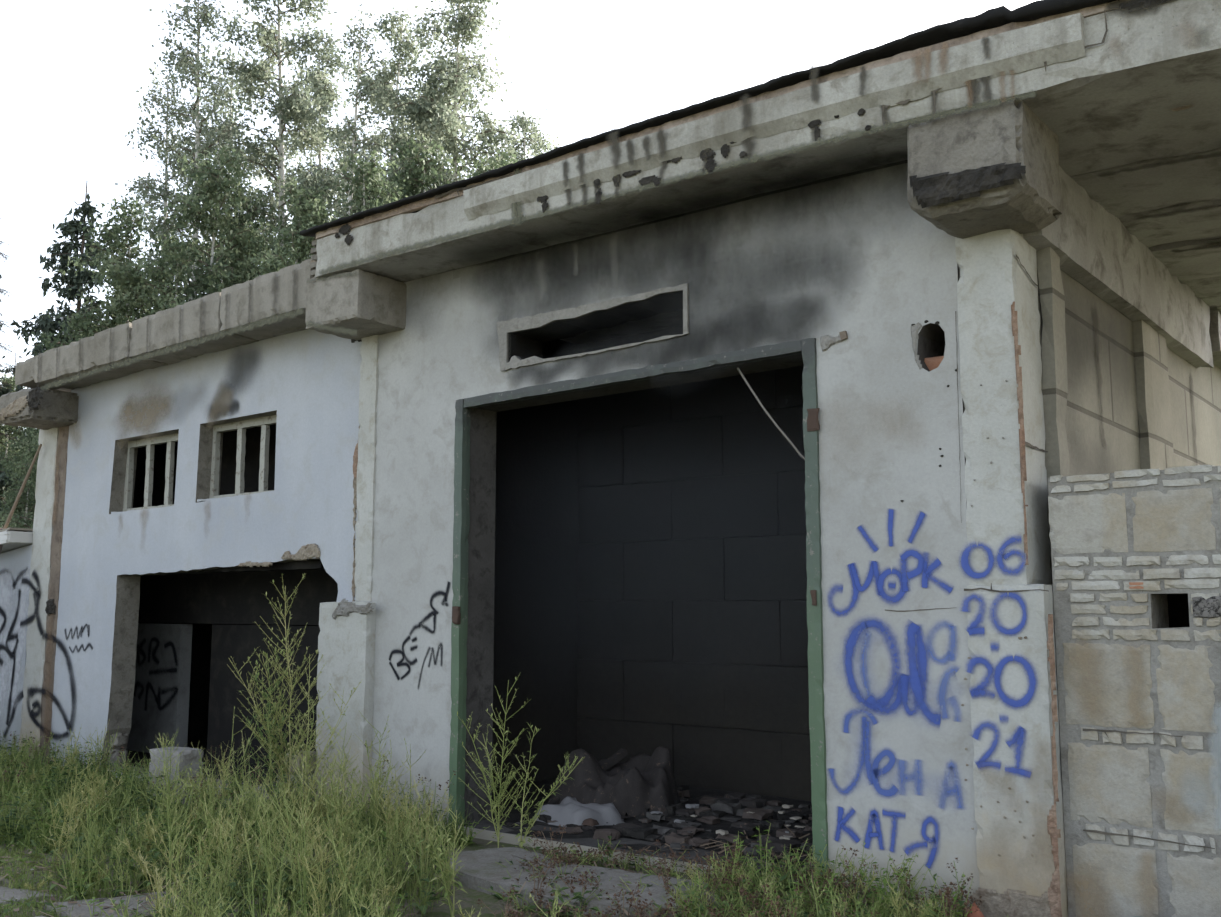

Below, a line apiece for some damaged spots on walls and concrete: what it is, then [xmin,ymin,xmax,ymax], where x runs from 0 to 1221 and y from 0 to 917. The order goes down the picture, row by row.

spalling [700,142,747,174]
spalling [537,195,548,213]
spalling [594,170,662,204]
spalling [910,162,1026,208]
leakage [37,270,356,390]
spalling [0,387,43,421]
spalling [238,543,321,567]